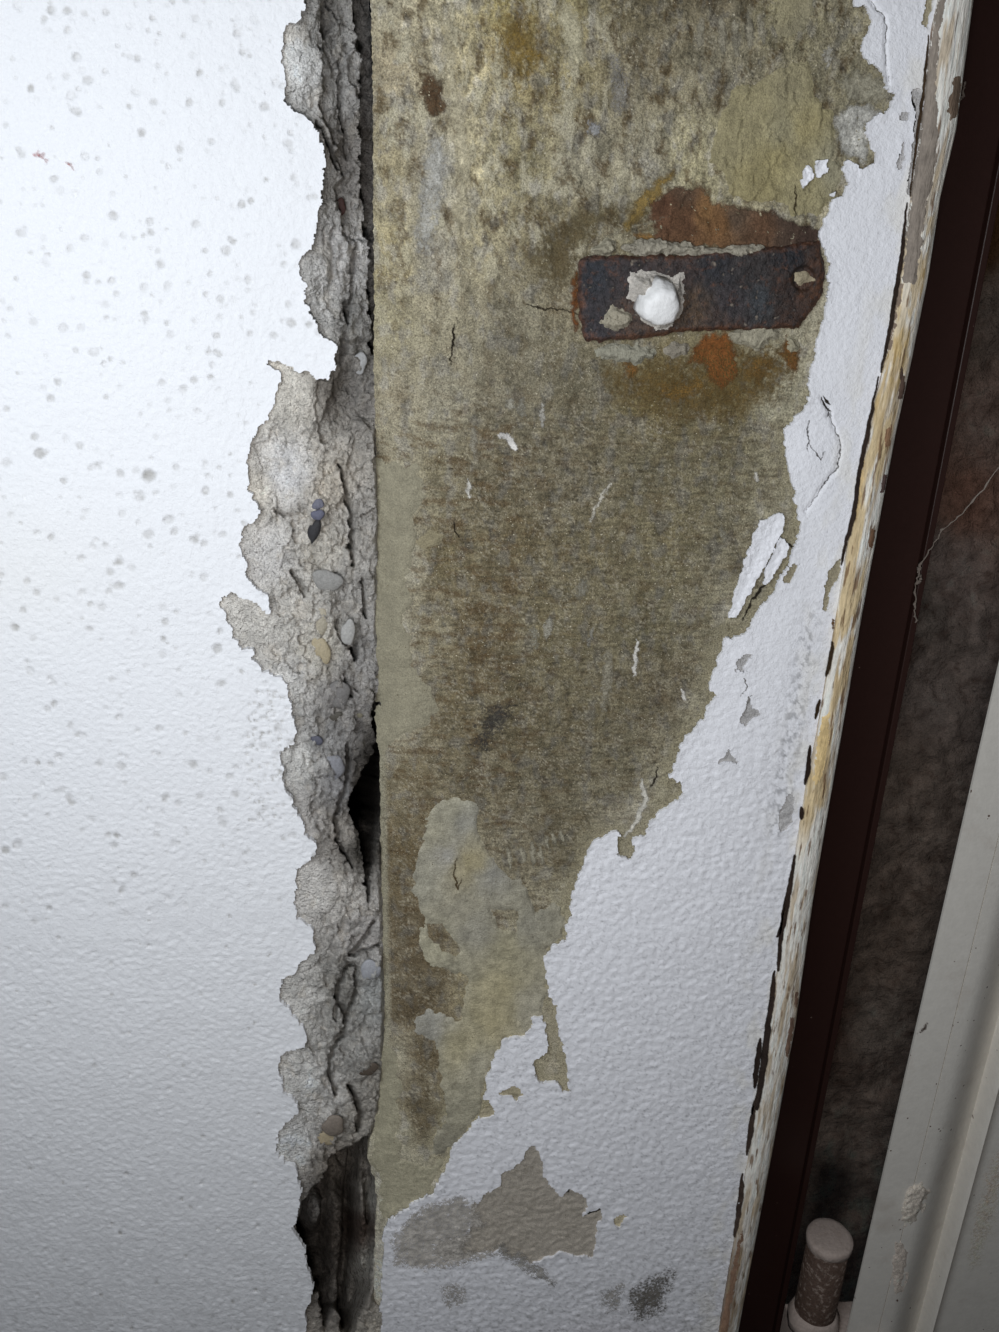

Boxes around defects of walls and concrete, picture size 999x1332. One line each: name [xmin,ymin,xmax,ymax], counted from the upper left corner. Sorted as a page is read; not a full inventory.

water stain [557,0,585,64]
crack [315,0,375,356]
water stain [418,8,471,251]
rust [624,172,819,249]
water stain [835,70,888,163]
rust [571,271,579,332]
rust [605,333,799,422]
crack [290,569,308,597]
crack [334,464,368,697]
peeling [220,0,962,1332]
crack [333,745,352,867]
crack [327,920,381,1131]